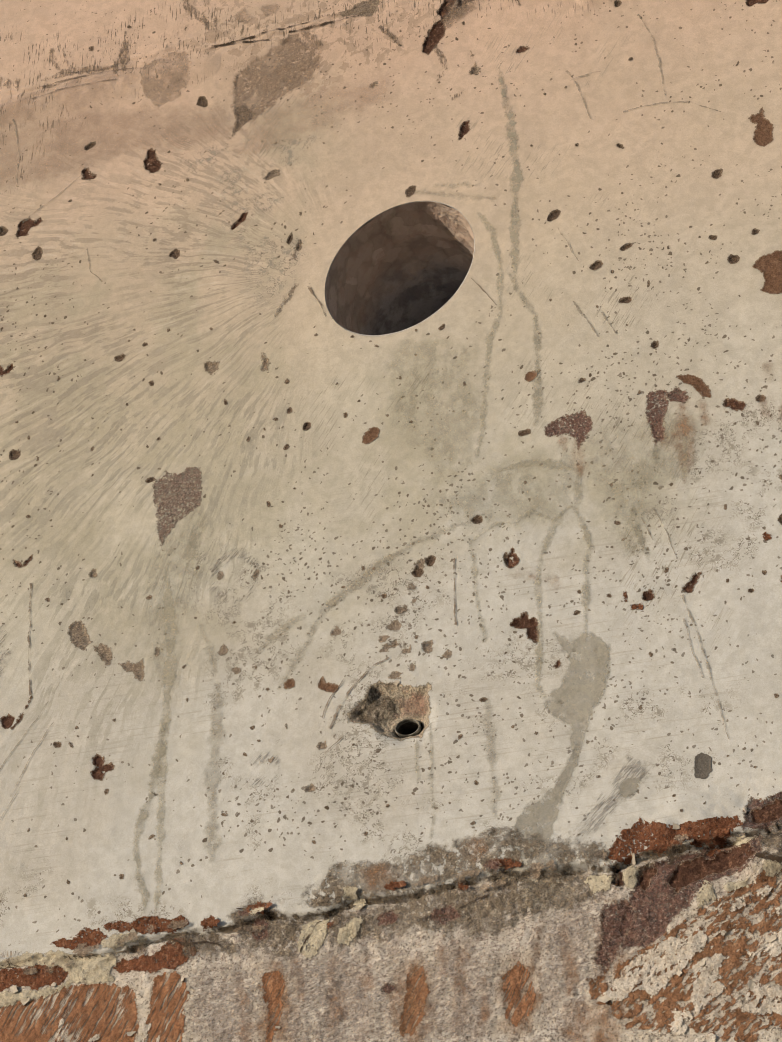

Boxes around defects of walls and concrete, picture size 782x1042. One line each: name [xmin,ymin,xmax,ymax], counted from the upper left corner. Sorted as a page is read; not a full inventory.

spalling [752,250,782,294]
spalling [544,410,593,450]
spalling [637,374,766,446]
spalling [145,467,202,546]
peeling [0,633,782,1042]
crack [578,825,782,874]
crack [63,870,549,960]